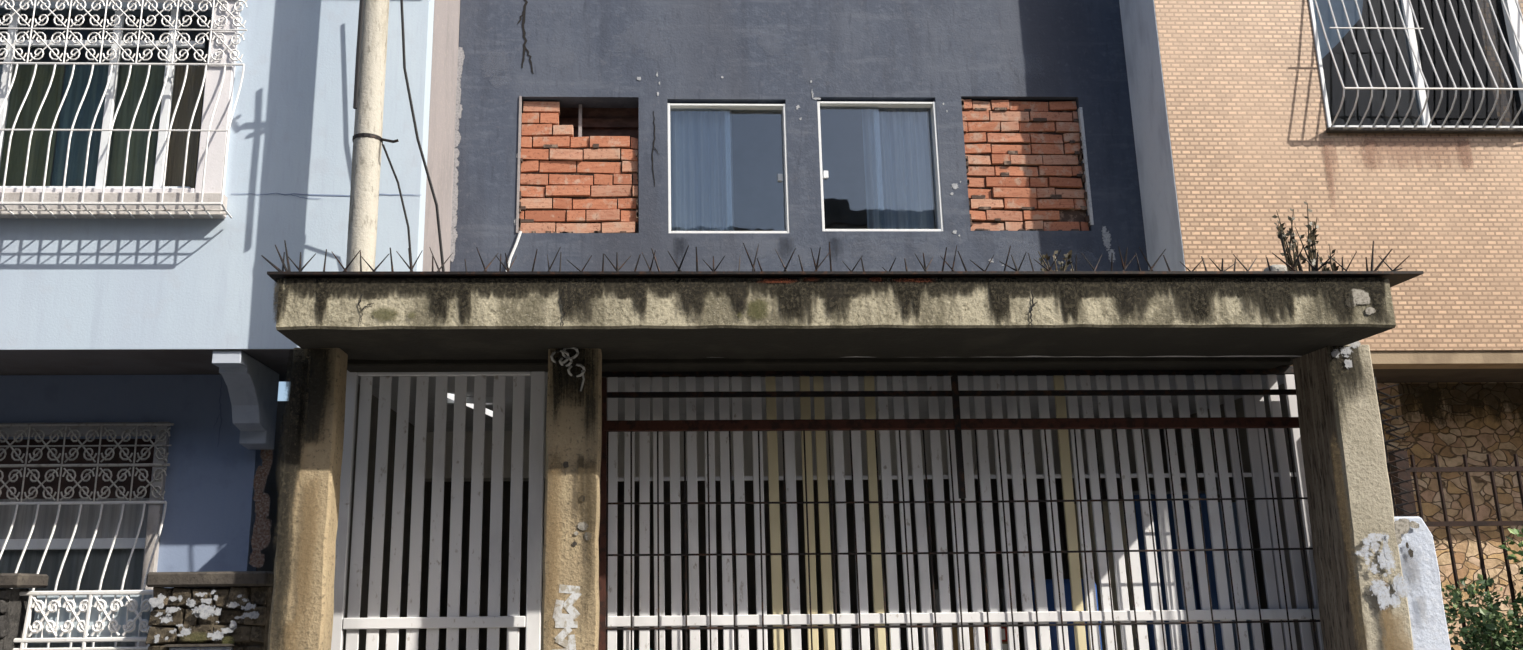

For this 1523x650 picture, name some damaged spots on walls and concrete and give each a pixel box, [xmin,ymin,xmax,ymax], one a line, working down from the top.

crack [517,0,534,74]
leakage [273,277,1389,324]
peeling [1355,518,1419,611]
peeling [148,590,259,643]